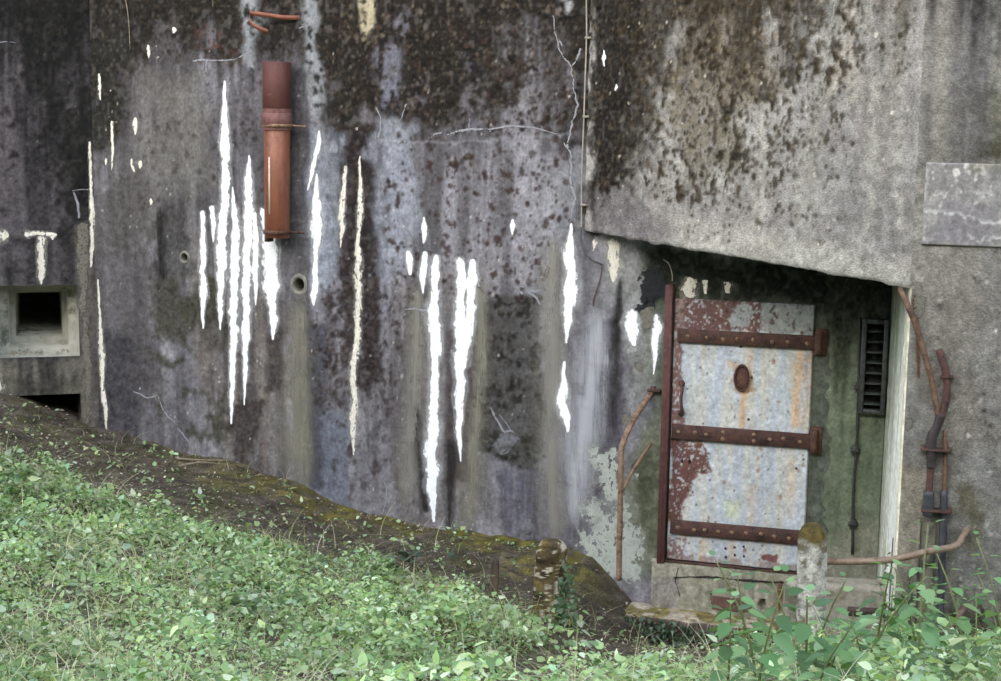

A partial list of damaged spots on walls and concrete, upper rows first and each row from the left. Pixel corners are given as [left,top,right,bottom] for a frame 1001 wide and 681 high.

leakage [24,231,57,284]
leakage [199,81,280,424]
leakage [283,131,322,483]
leakage [337,157,363,455]
leakage [399,217,487,530]
leakage [541,223,639,540]
peeling [574,440,645,584]
leakage [651,314,662,374]